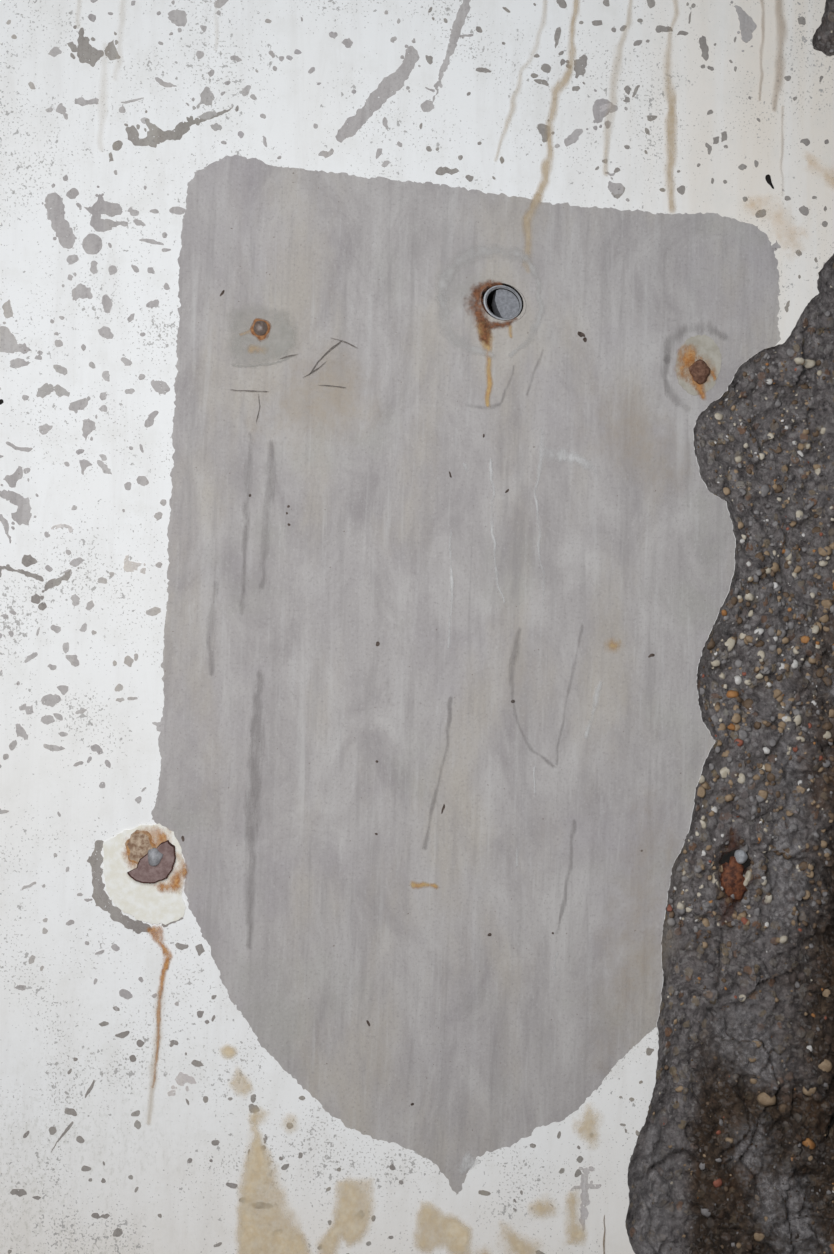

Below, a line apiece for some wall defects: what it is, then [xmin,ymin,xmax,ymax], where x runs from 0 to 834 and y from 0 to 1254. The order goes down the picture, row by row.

peeling [579,0,716,71]
peeling [729,1,757,72]
water stain [524,0,578,255]
peeling [697,131,728,167]
rust [470,281,516,407]
rust [680,348,716,399]
rust [125,830,167,865]
rust [158,865,187,891]
rust [720,834,747,915]
rust [148,927,171,1085]